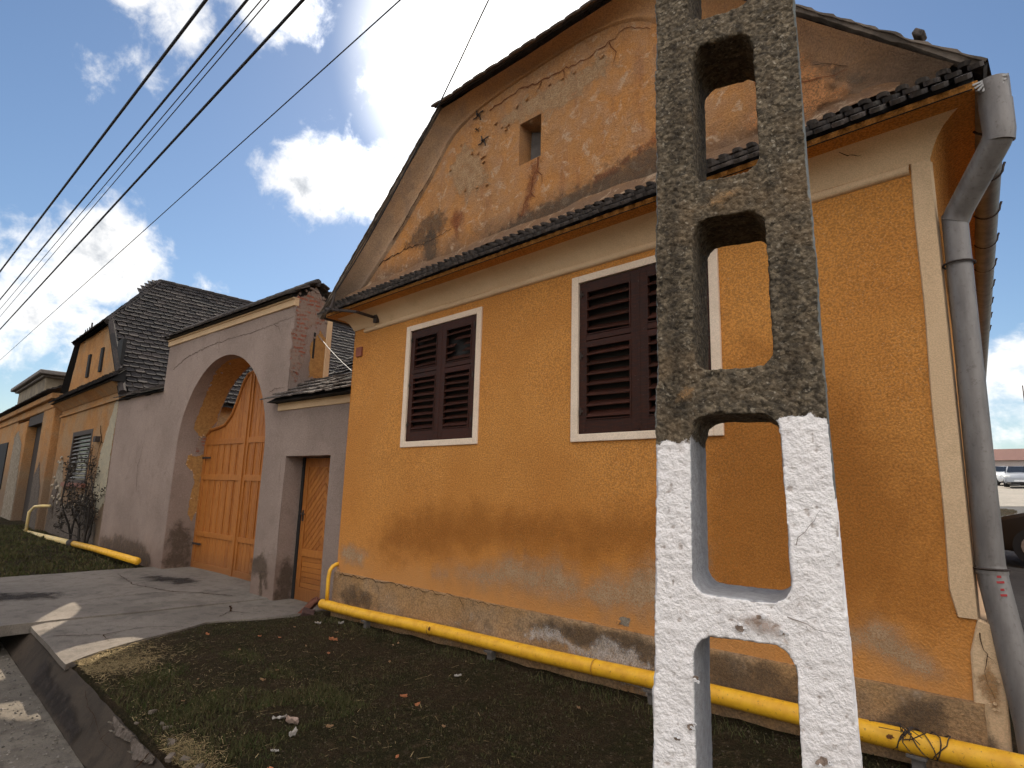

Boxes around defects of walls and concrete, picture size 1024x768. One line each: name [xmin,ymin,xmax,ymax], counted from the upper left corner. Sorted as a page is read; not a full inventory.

crack [490,26,650,111]
crack [378,157,447,267]
leakage [408,210,446,261]
leakage [501,147,657,231]
spalling [289,287,327,383]
flaking render [186,358,250,521]
leakage [250,555,293,600]
leakage [474,561,656,607]
leakage [524,623,655,669]
leakage [710,655,798,704]